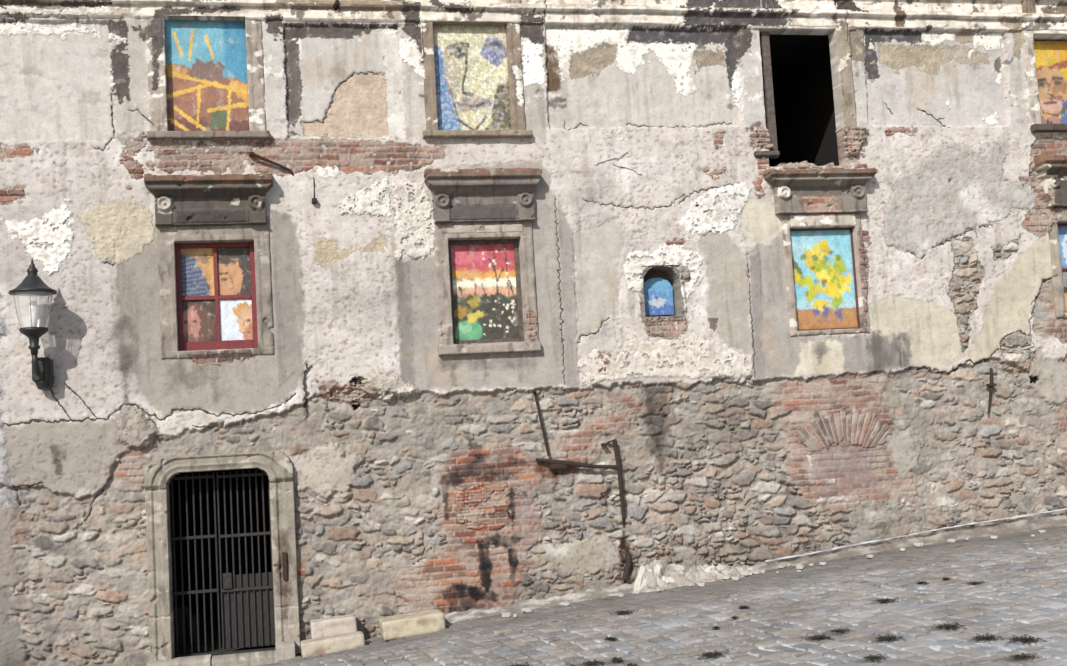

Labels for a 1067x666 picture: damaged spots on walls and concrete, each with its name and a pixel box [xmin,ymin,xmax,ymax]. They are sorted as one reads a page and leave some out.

peeling [512,0,798,110]
flaking render [0,0,474,277]
flaking render [885,126,917,136]
peeling [623,166,765,340]
flaking render [857,138,1058,352]
crack [1,363,312,443]
crack [13,482,43,505]
crack [78,478,111,526]
water stain [468,542,496,602]
water stain [508,548,518,573]